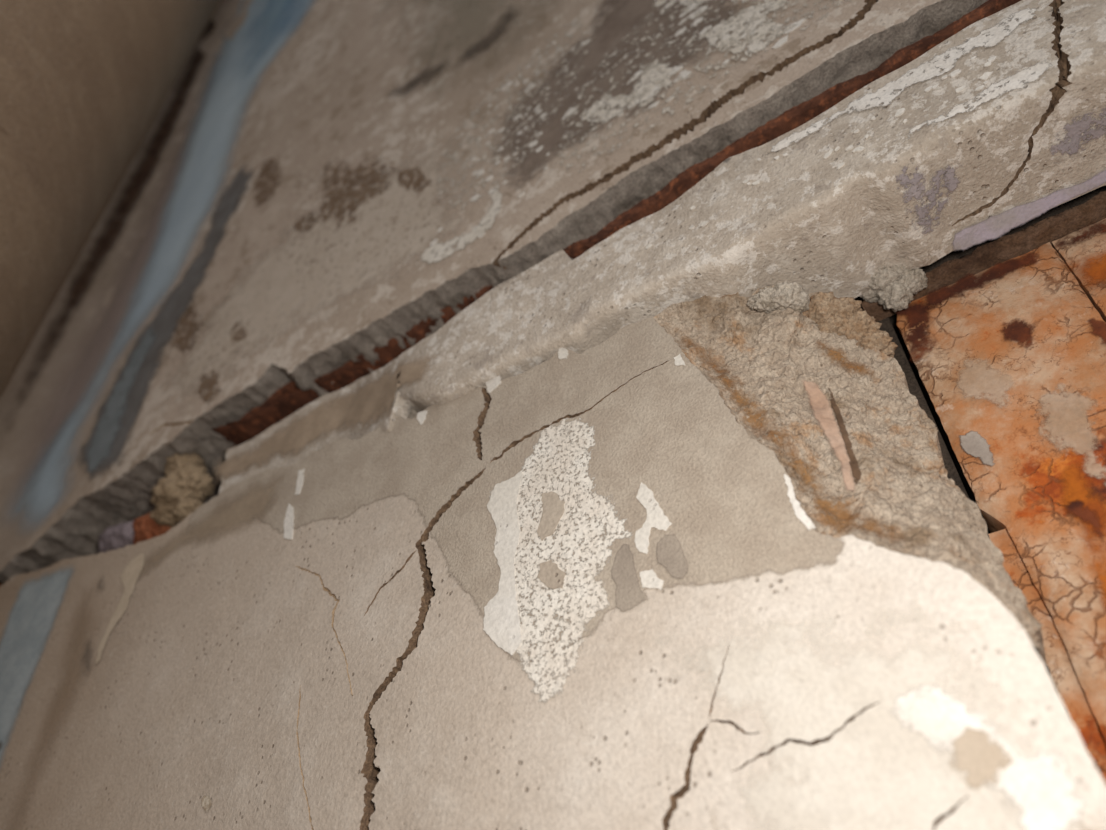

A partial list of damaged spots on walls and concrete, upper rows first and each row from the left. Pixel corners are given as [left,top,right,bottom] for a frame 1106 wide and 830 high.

water stain [169,301,255,402]
water stain [253,156,448,283]
rust [211,285,493,452]
crack [0,0,988,584]
peeling [419,0,835,264]
rust [563,0,1021,259]
peeling [771,8,1052,160]
rust [897,253,1037,361]
crack [952,0,1072,226]
crack [295,360,670,830]
peeling [187,280,1047,702]
crack [662,646,879,830]